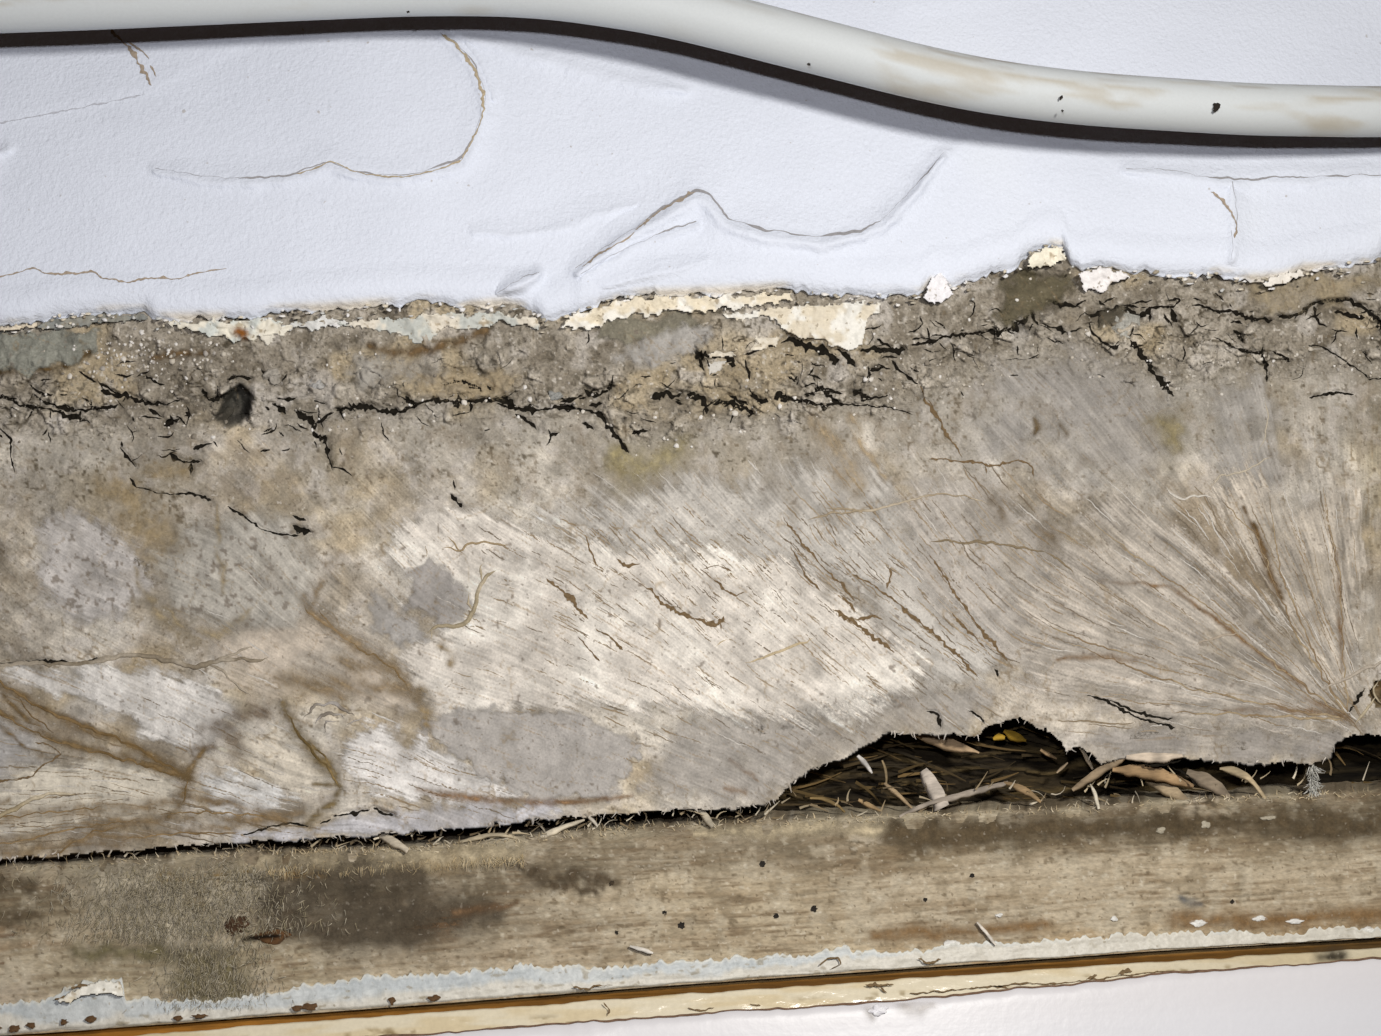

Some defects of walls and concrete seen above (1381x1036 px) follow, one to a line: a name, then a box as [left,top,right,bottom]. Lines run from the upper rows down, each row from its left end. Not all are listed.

spalling [0,246,1381,446]
crack [0,293,1381,537]
damp [275,581,431,727]
damp [0,682,524,1015]
damp [551,882,597,894]
damp [692,822,883,838]